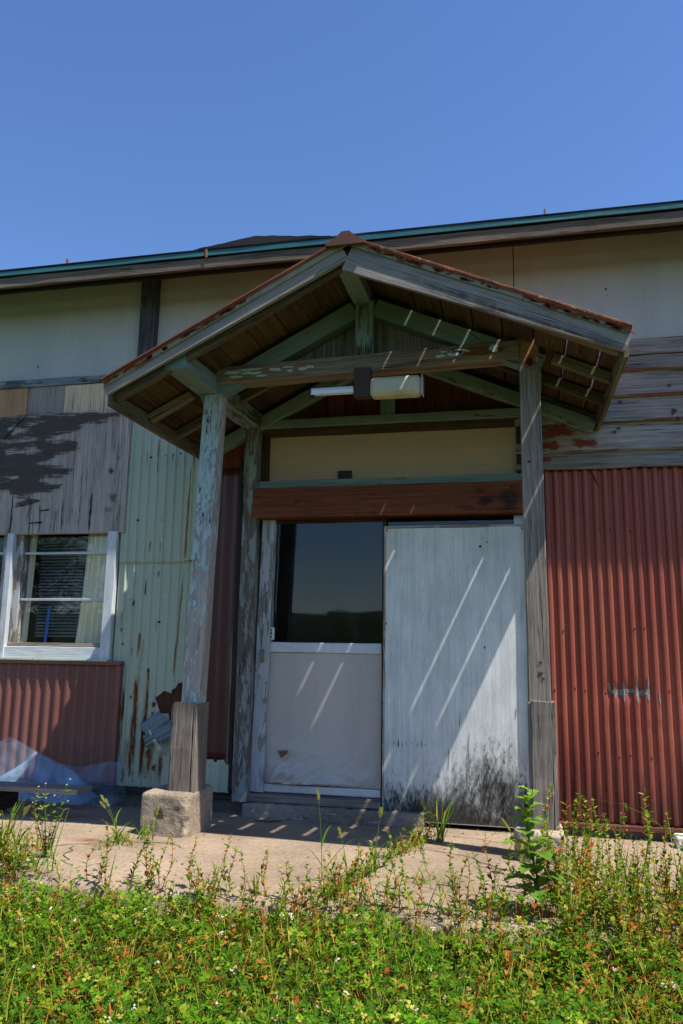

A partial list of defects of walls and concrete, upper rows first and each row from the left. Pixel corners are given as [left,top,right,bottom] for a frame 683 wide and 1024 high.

corrosion [366,247,499,289]
corrosion [181,298,247,339]
corrosion [523,295,635,334]
peeling [542,423,619,462]
corrosion [119,613,162,781]
damp [384,739,529,827]